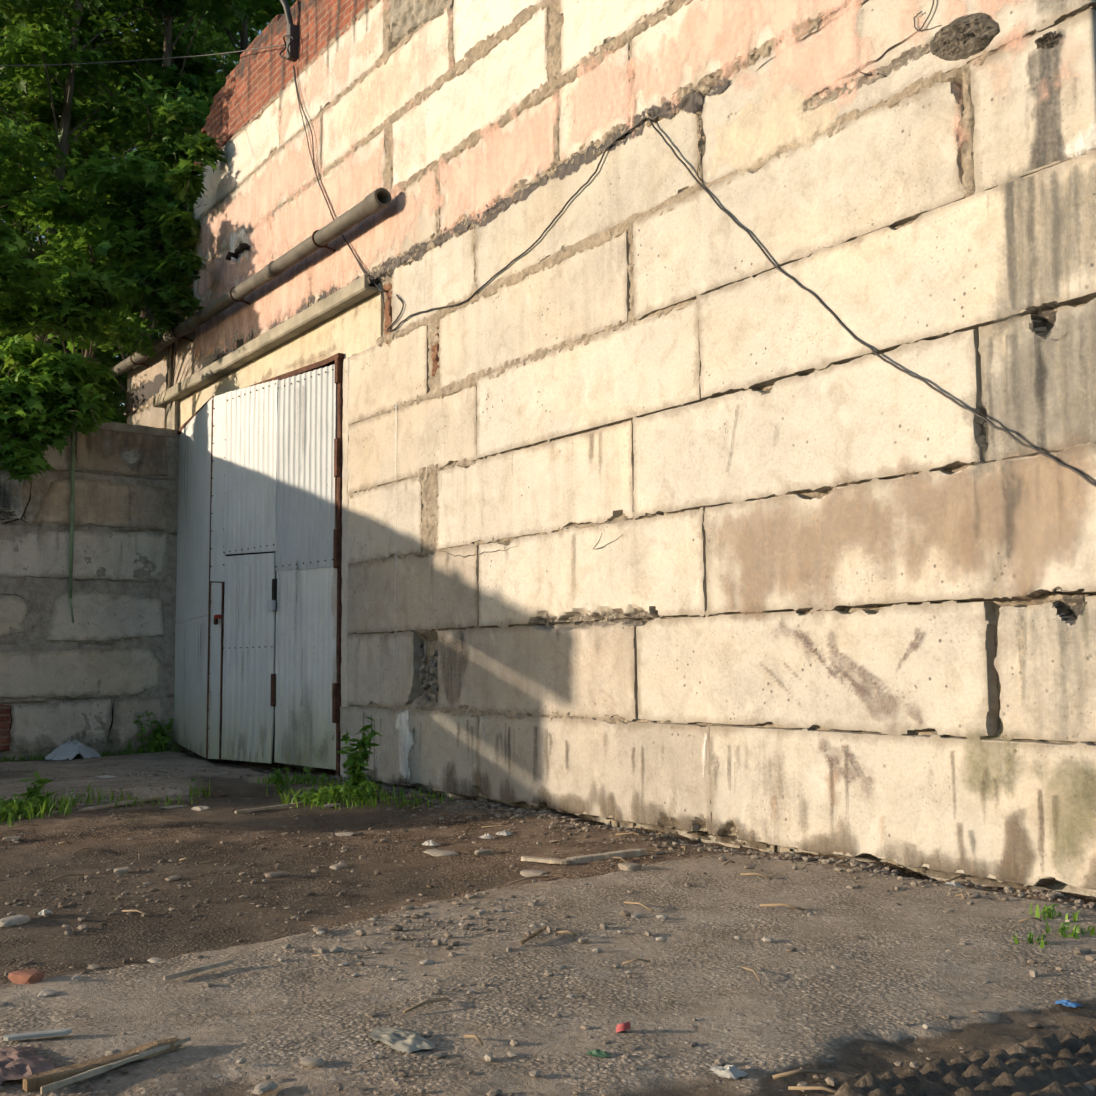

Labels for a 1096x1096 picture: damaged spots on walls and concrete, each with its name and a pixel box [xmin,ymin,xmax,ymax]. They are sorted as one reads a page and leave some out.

water stain [1029,32,1096,169]
peeling [194,96,557,357]
water stain [213,77,733,362]
water stain [1005,174,1079,309]
water stain [126,373,168,414]
spalling [529,608,658,630]
spalling [1052,586,1094,623]
water stain [395,710,414,779]
water stain [1001,791,1043,880]